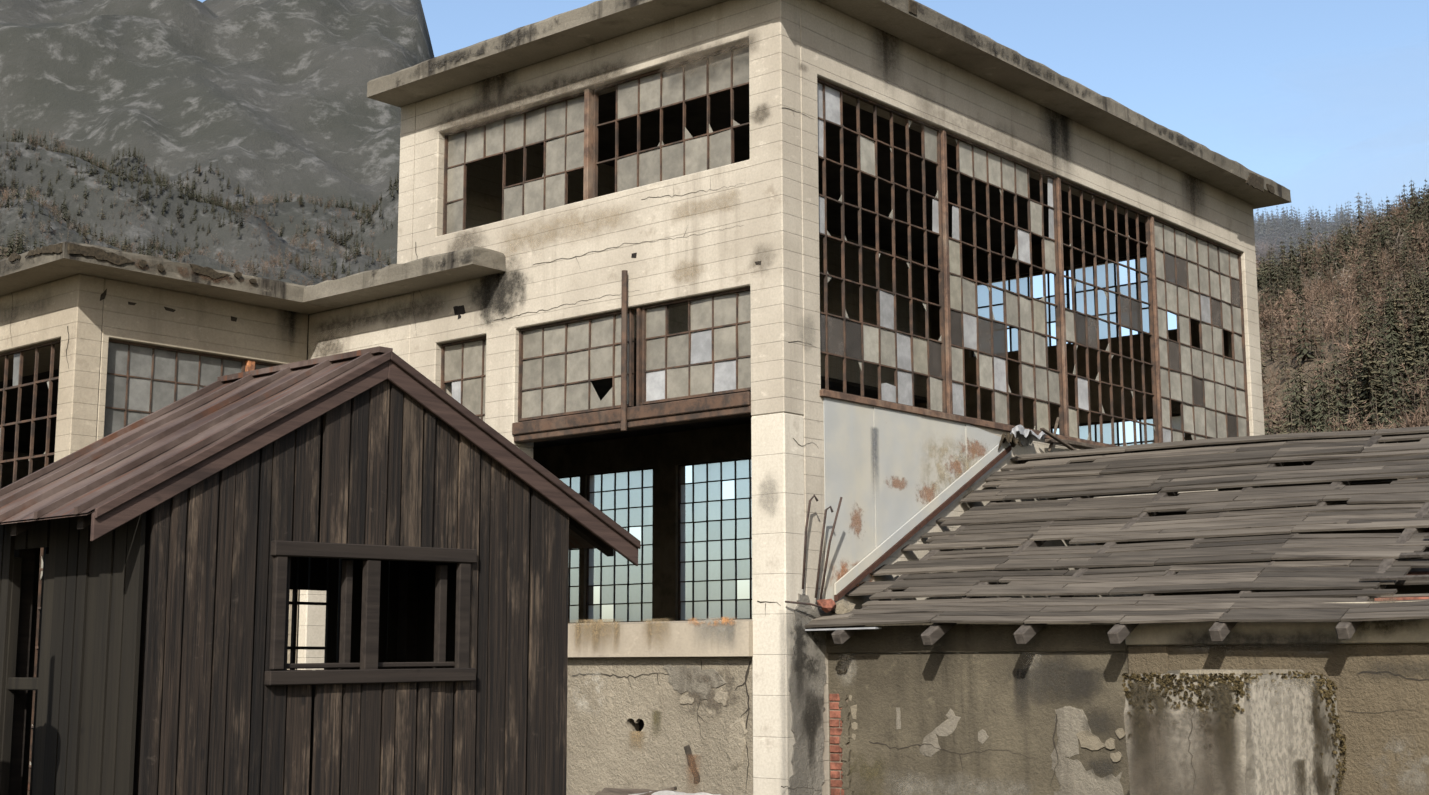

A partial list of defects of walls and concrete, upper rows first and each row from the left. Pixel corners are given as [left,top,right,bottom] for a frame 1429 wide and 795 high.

water stain [473,271,524,322]
corrosion [951,440,985,473]
crack [572,662,708,741]
flaking render [829,691,858,795]
flaking render [919,708,961,757]
flaking render [978,729,989,745]
flaking render [1051,706,1126,795]
water stain [1214,684,1234,760]
water stain [1251,683,1339,795]
crack [1345,671,1429,713]